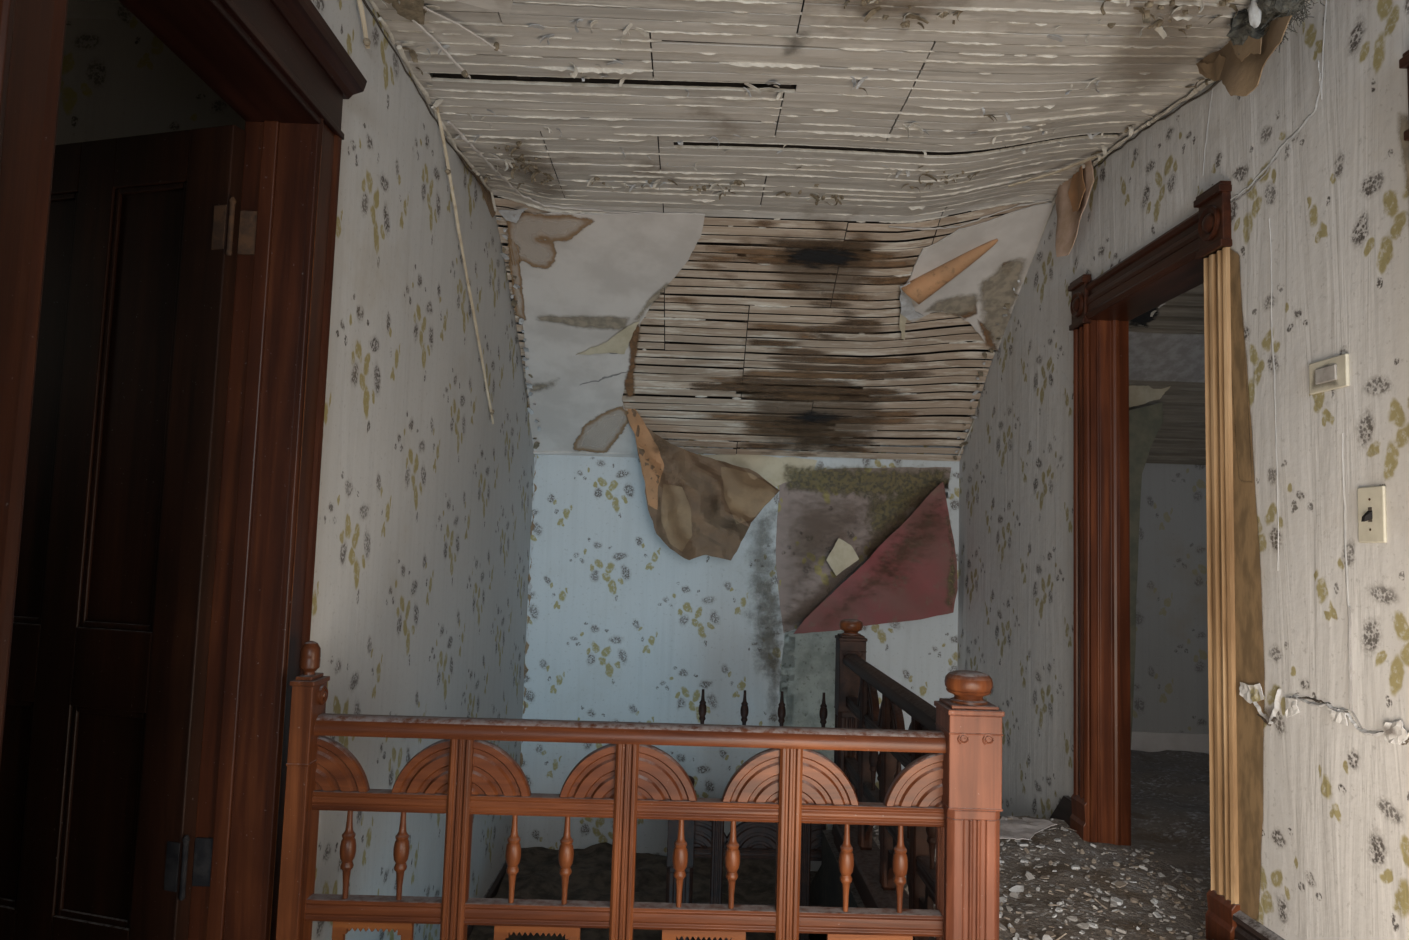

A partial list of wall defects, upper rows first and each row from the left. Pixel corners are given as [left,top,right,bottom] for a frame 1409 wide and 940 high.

peeling [844,0,963,29]
peeling [1085,0,1238,43]
peeling [569,23,649,87]
peeling [743,81,784,100]
peeling [461,141,554,218]
peeling [587,176,745,200]
peeling [776,184,844,206]
peeling [881,122,980,191]
peeling [1082,132,1107,168]
damp [927,260,1023,351]
damp [694,221,947,541]
damp [755,522,777,672]